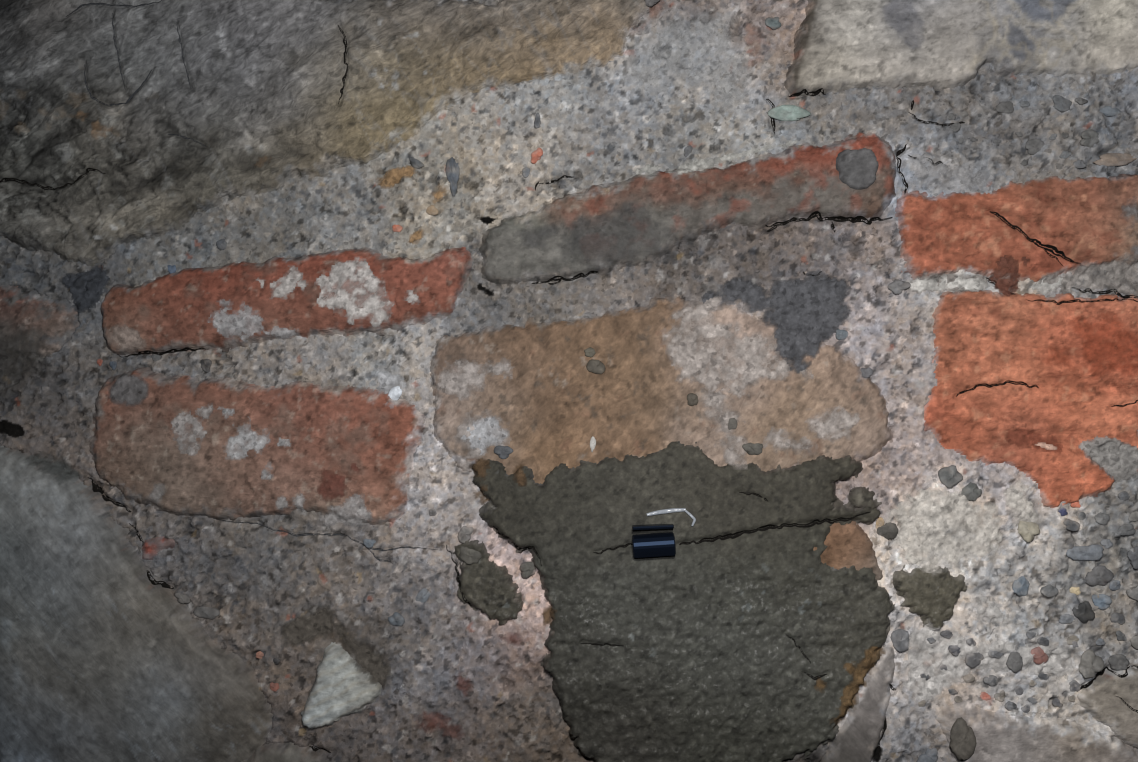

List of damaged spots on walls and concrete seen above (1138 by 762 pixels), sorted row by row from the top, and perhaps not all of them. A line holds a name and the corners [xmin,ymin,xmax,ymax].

crack [337,24,348,104]
crack [909,100,965,126]
crack [896,145,947,193]
crack [766,211,893,232]
crack [532,271,599,285]
crack [986,211,1138,305]
crack [679,492,871,545]
crack [593,543,633,554]